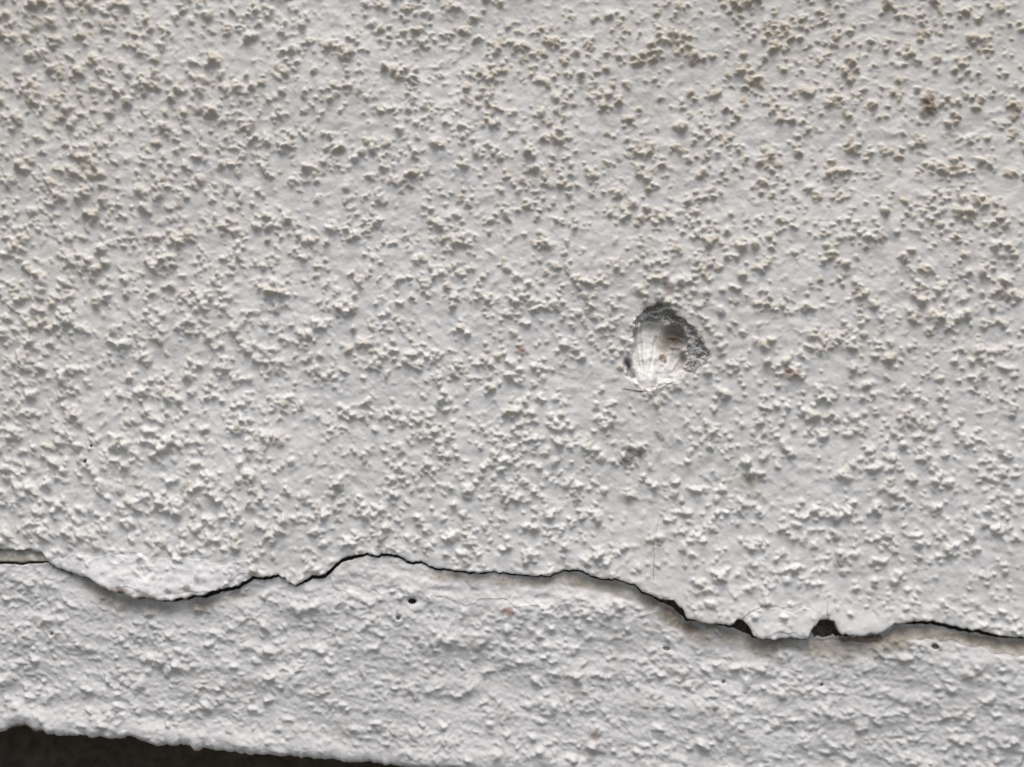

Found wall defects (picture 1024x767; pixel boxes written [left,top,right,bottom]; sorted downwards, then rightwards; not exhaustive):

crack [0,561,90,582]
crack [120,507,850,640]
crack [895,621,1024,638]